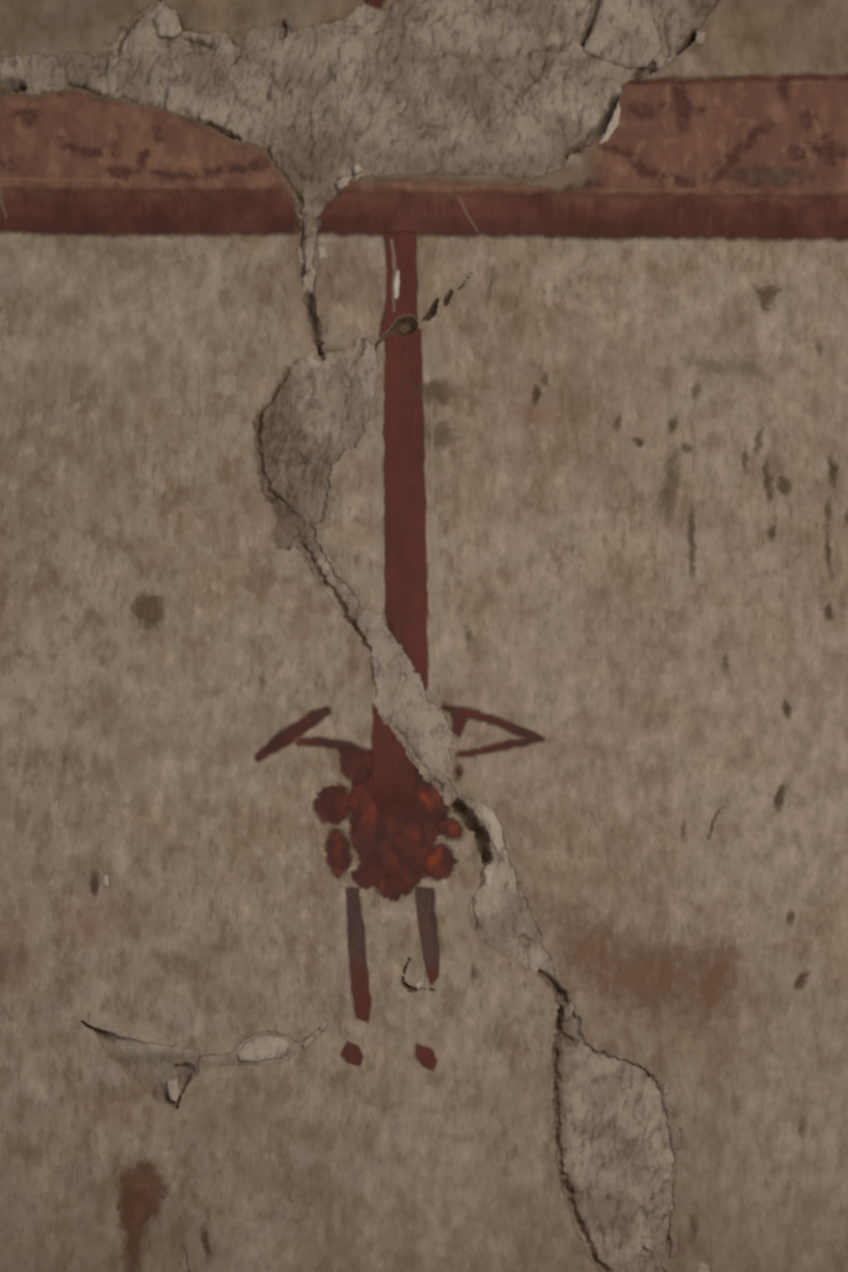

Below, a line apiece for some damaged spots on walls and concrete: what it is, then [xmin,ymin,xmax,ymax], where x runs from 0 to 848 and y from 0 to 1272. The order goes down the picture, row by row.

flaking render [0,0,719,551]
spalling [764,467,788,497]
flaking render [84,1020,327,1108]
spalling [552,1008,682,1272]